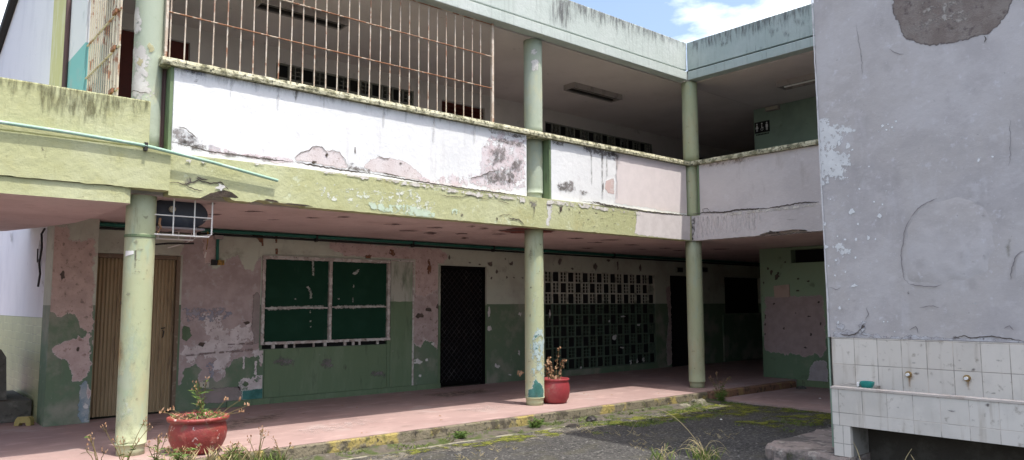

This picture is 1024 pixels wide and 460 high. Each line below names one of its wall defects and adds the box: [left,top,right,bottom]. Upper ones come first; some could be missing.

peeling [131,7,154,100]
damp [553,0,638,26]
damp [694,8,803,48]
flaking render [892,0,1012,46]
damp [28,81,149,115]
peeling [295,131,526,231]
crack [170,142,818,223]
peeling [819,118,855,200]
peeling [825,188,876,276]
peeling [50,224,98,423]
peeling [178,233,450,400]
crack [836,308,869,336]